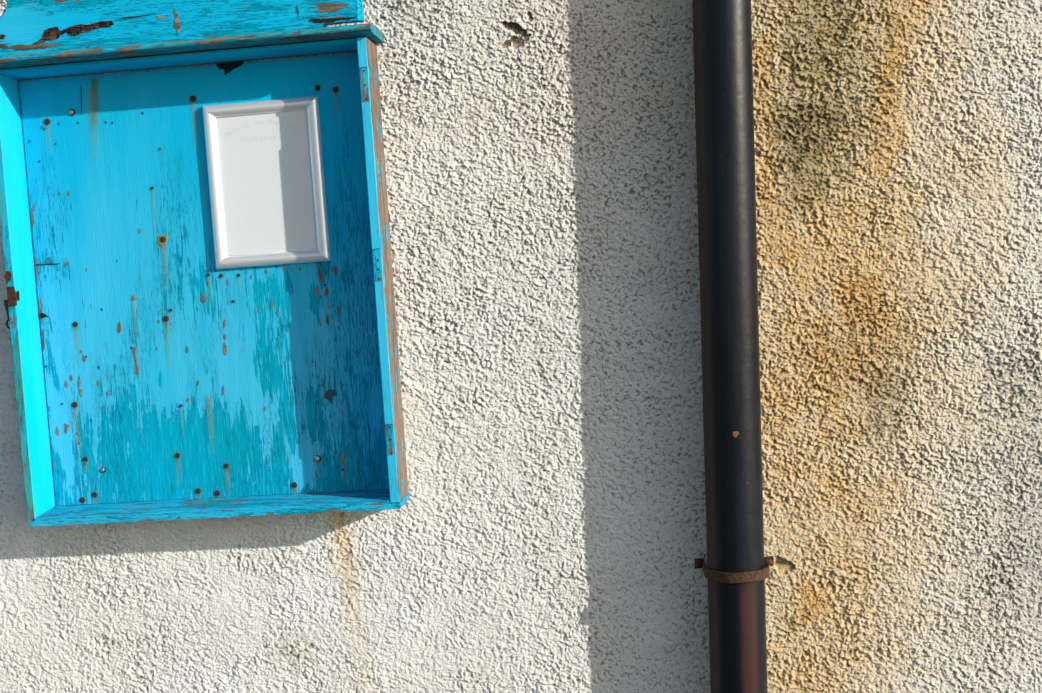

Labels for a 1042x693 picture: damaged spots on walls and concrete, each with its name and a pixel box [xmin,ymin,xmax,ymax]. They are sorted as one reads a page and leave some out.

spalling [501,12,533,49]